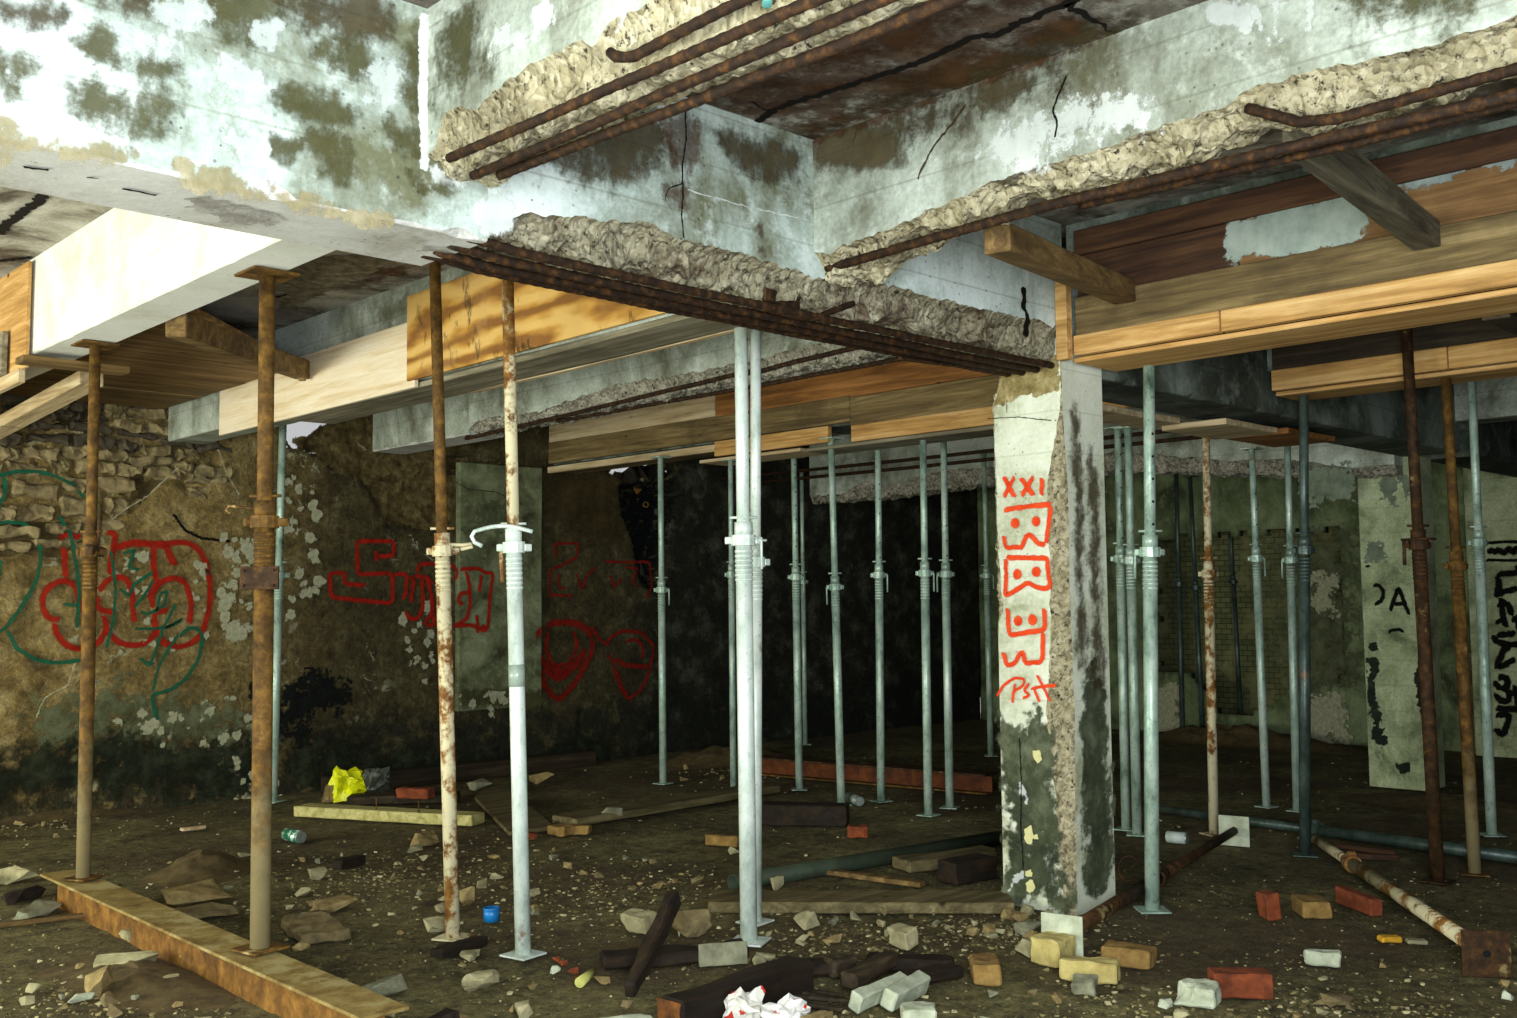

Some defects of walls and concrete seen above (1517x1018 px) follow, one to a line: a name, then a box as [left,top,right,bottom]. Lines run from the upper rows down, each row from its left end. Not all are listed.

damp [0,0,181,139]
damp [206,0,516,237]
crack [751,0,1115,123]
crack [918,105,966,180]
crack [1052,76,1067,137]
damp [1350,0,1476,38]
flaking render [0,394,31,414]
flaking render [0,401,234,558]
spalling [275,0,1517,912]